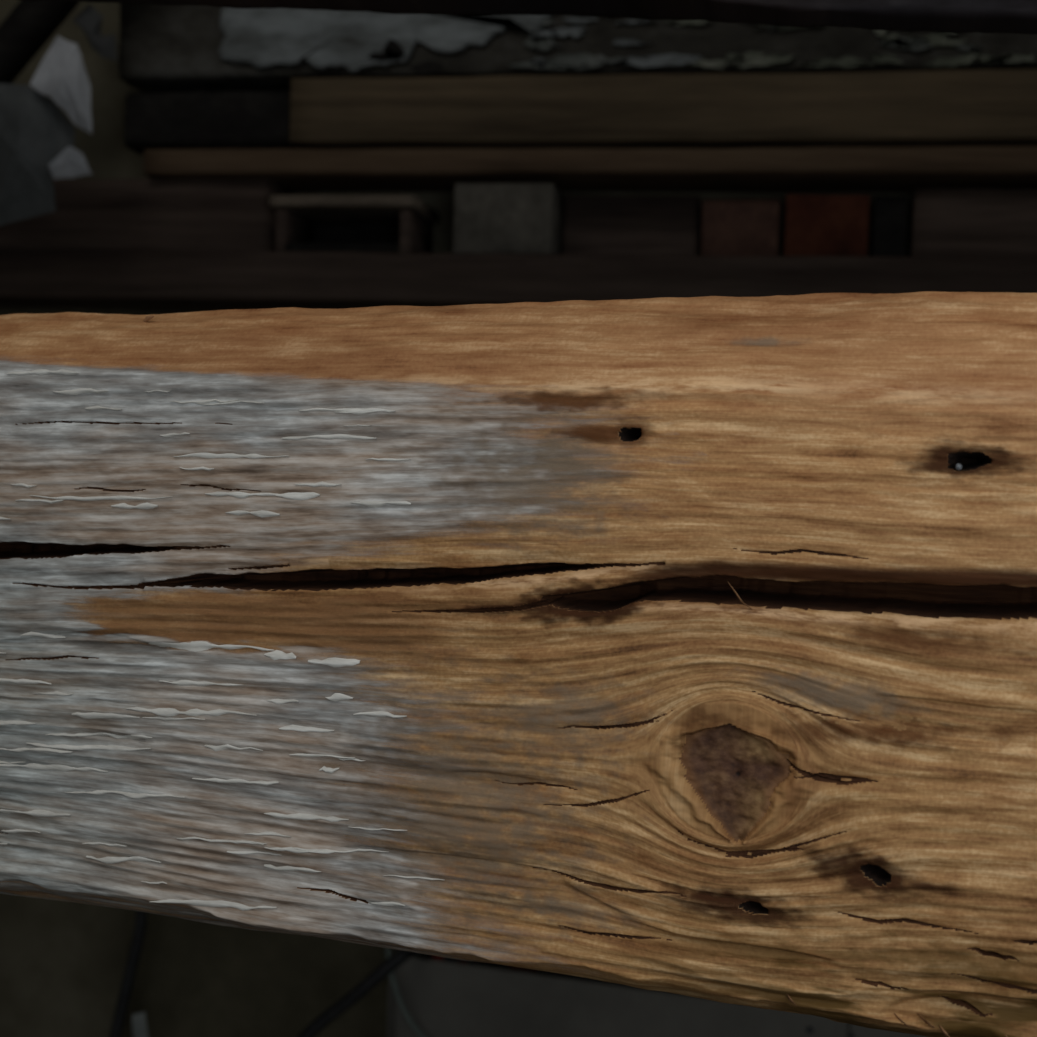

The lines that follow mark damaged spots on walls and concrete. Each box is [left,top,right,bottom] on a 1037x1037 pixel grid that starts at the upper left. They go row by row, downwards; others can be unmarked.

peeling [217,7,1036,73]
crack [0,542,1037,620]